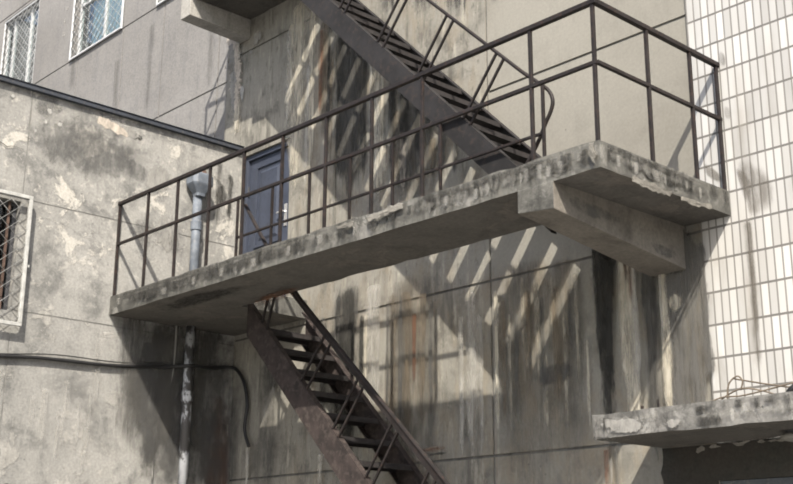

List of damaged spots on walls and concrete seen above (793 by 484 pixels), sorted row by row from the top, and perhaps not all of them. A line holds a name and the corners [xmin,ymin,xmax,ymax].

damp [739,170,767,209]
damp [122,318,236,479]
damp [335,286,379,391]
damp [459,292,483,448]
damp [493,290,512,425]
damp [549,273,591,422]
peeling [601,418,641,433]
damp [592,249,680,441]
damp [696,406,721,426]
damp [749,258,758,322]